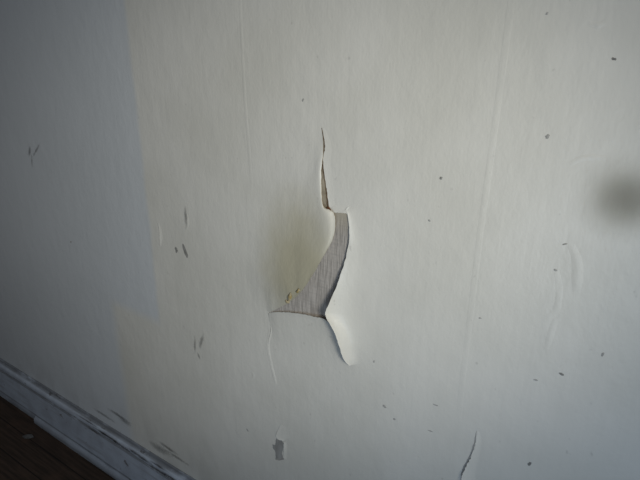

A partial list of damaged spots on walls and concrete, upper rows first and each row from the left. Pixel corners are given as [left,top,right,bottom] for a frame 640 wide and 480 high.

peeling [246,124,386,371]
crack [461,431,481,480]